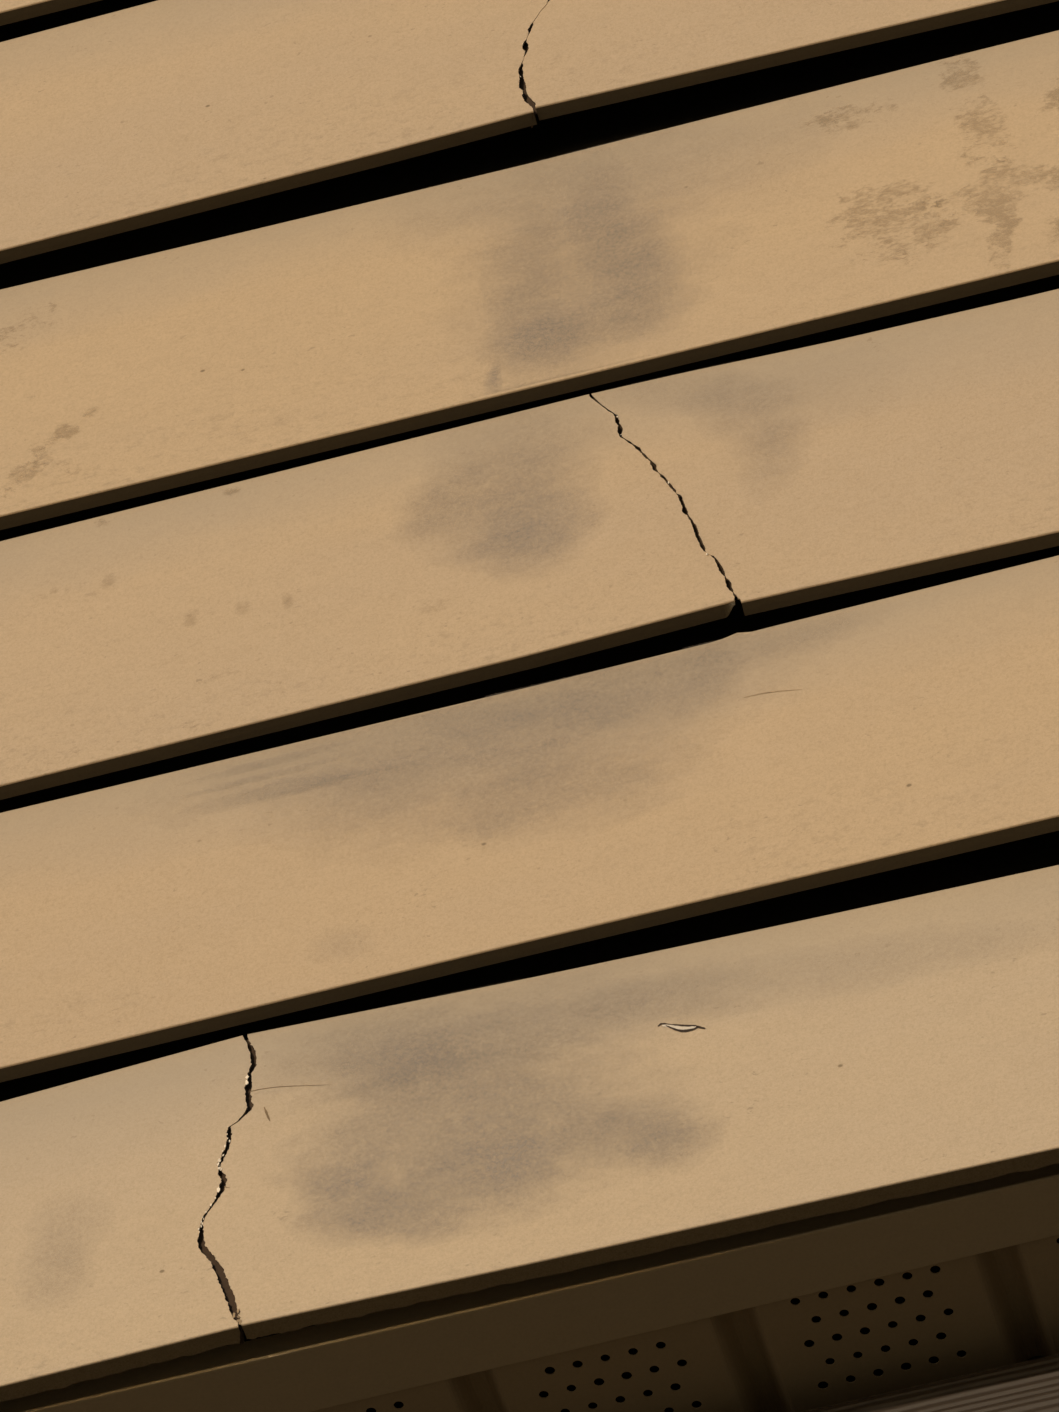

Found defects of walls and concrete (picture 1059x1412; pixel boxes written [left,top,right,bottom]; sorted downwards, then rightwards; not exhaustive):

crack [519,0,550,128]
crack [593,399,739,600]
crack [198,1039,332,1344]